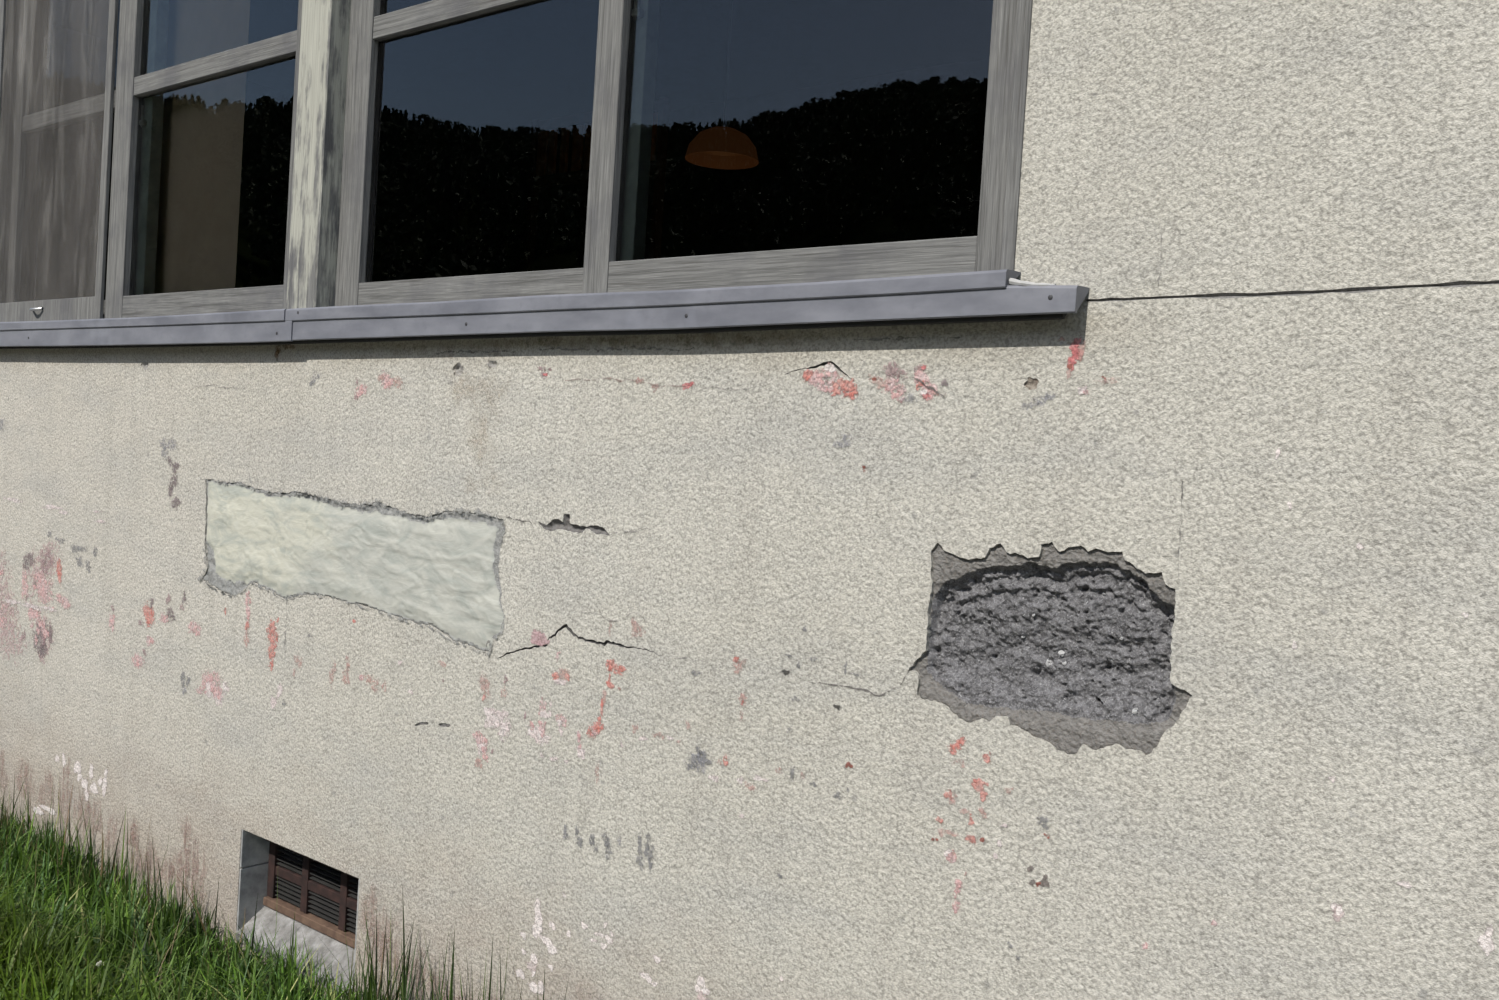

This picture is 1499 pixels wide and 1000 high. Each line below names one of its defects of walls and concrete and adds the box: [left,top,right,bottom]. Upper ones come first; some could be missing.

peeling [785,361,948,403]
peeling [0,542,71,664]
spalling [203,479,609,651]
crack [485,624,661,658]
peeling [472,669,586,768]
spalling [810,542,1192,913]